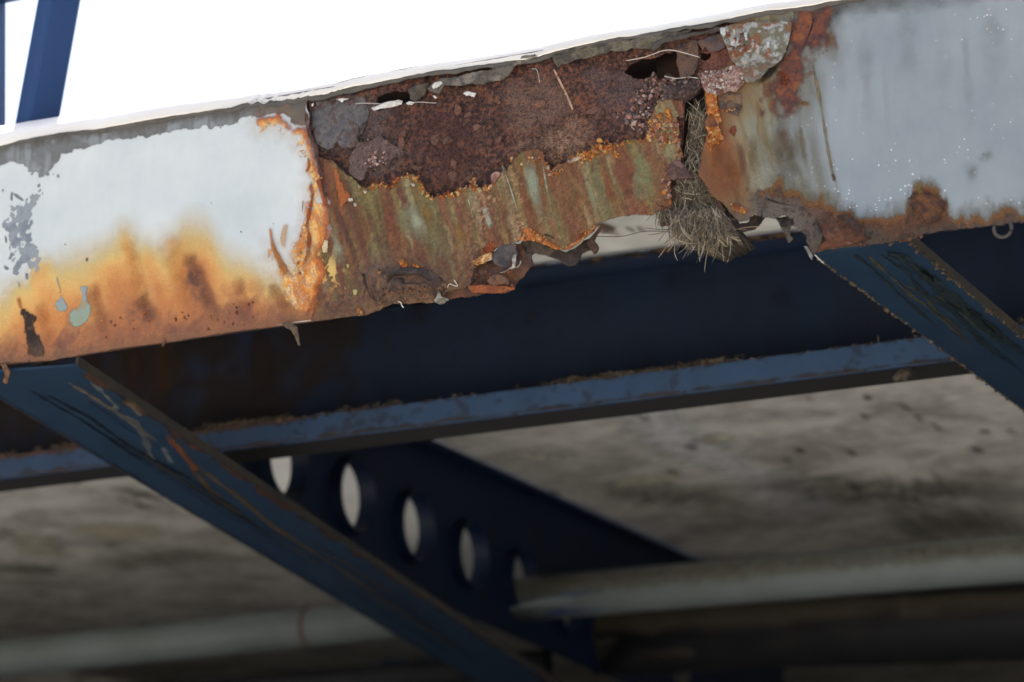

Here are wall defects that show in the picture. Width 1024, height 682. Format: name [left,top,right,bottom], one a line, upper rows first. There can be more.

peeling [0,100,307,286]
rust [0,6,1024,368]
peeling [55,278,91,327]